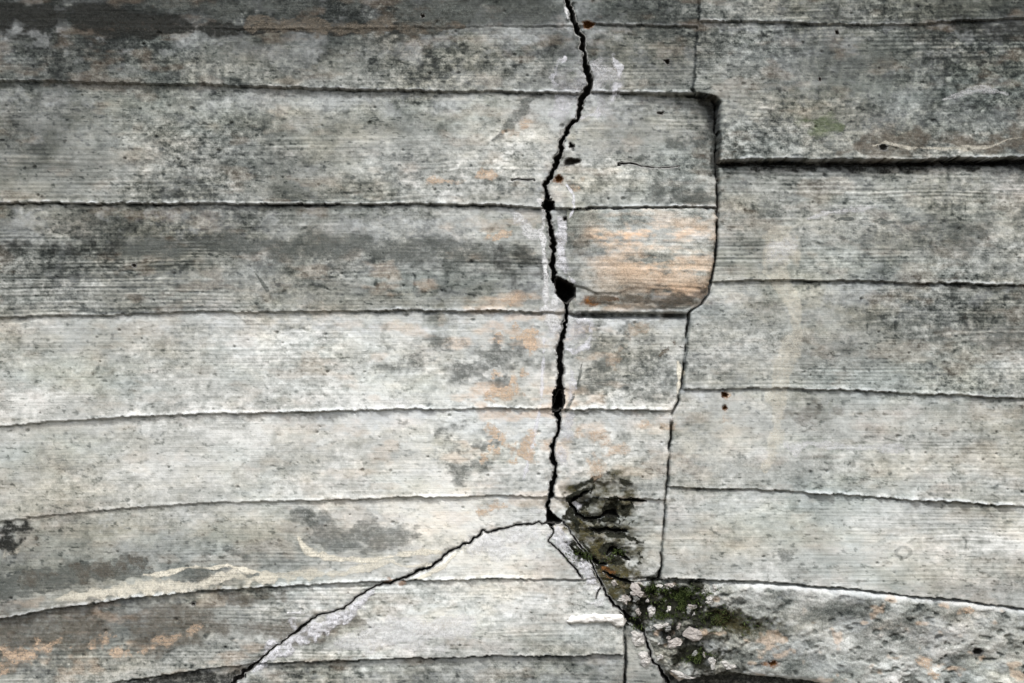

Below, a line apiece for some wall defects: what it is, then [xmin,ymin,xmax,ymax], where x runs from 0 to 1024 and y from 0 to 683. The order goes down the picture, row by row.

crack [231,0,680,683]
water stain [551,526,603,605]
water stain [619,579,819,683]